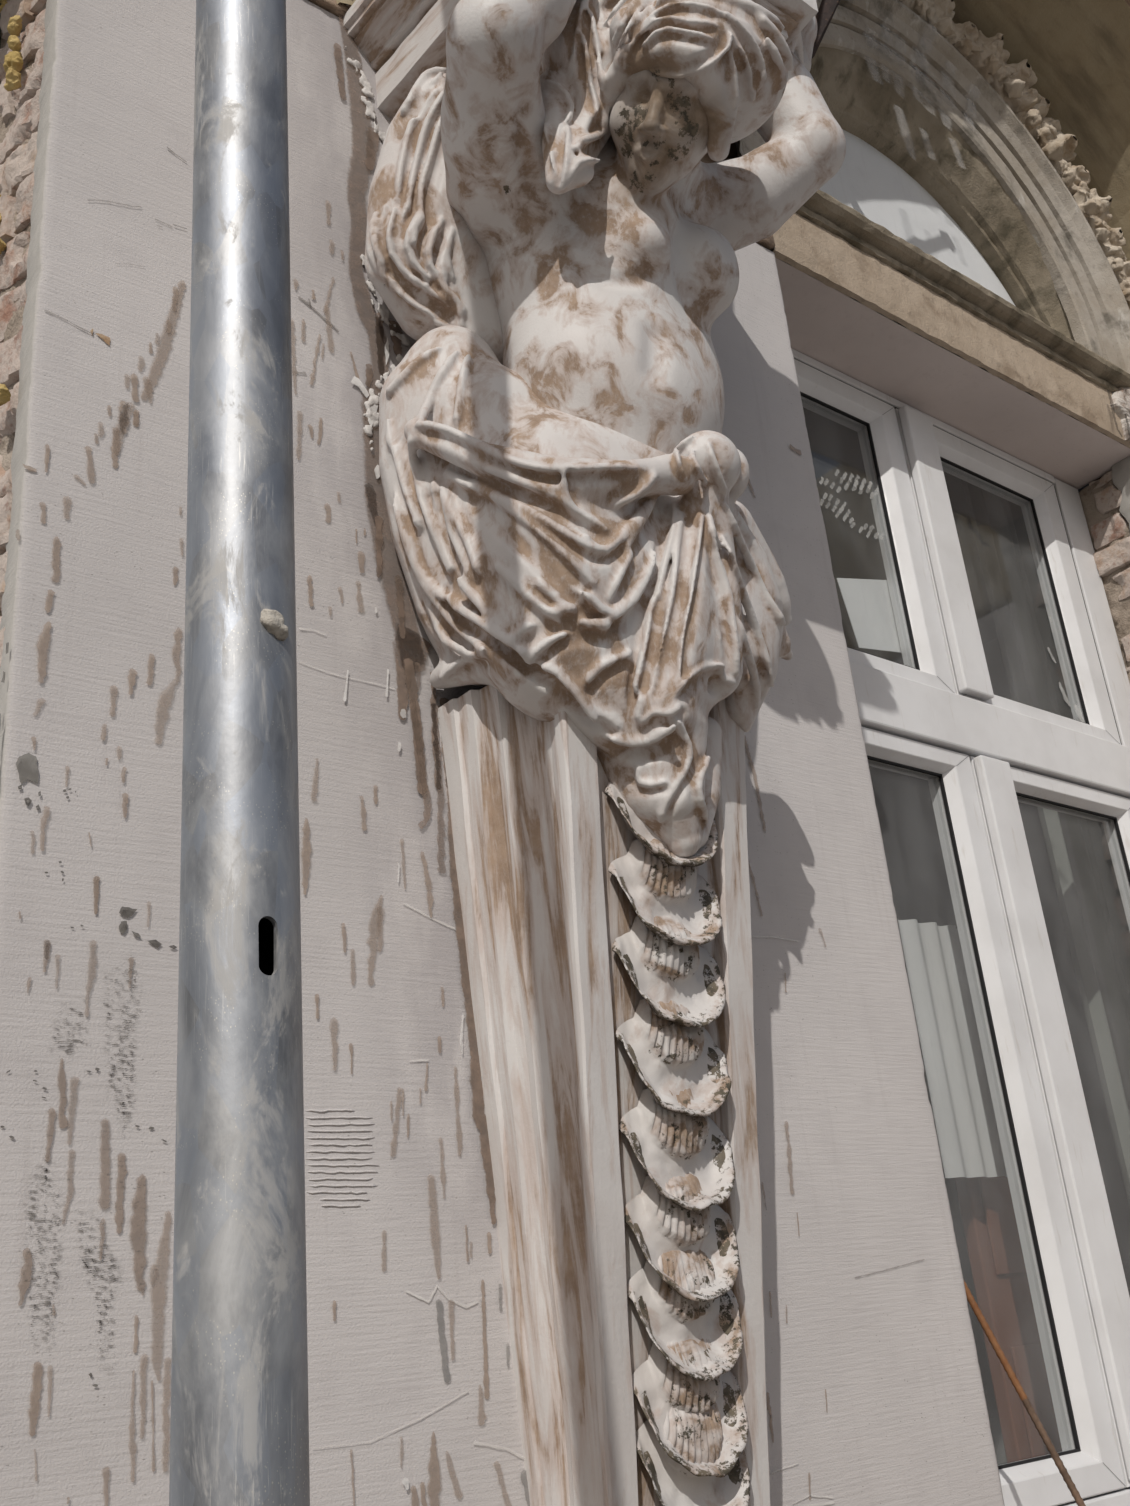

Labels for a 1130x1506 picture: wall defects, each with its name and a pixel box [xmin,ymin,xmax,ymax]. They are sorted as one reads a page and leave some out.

spalling [16,753,41,810]
spalling [119,907,177,949]